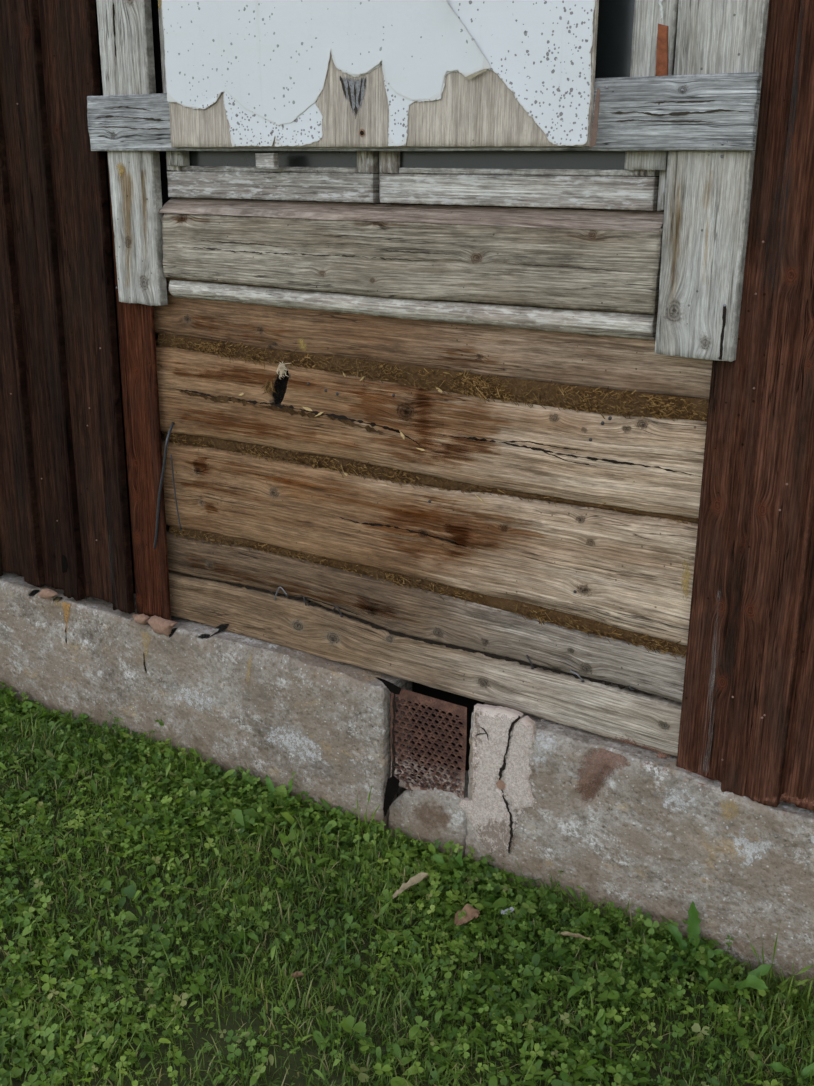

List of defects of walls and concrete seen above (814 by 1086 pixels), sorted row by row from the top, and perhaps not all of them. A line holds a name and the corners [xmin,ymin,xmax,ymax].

peeling [162,0,600,147]
crack [172,388,701,477]
crack [476,716,521,853]